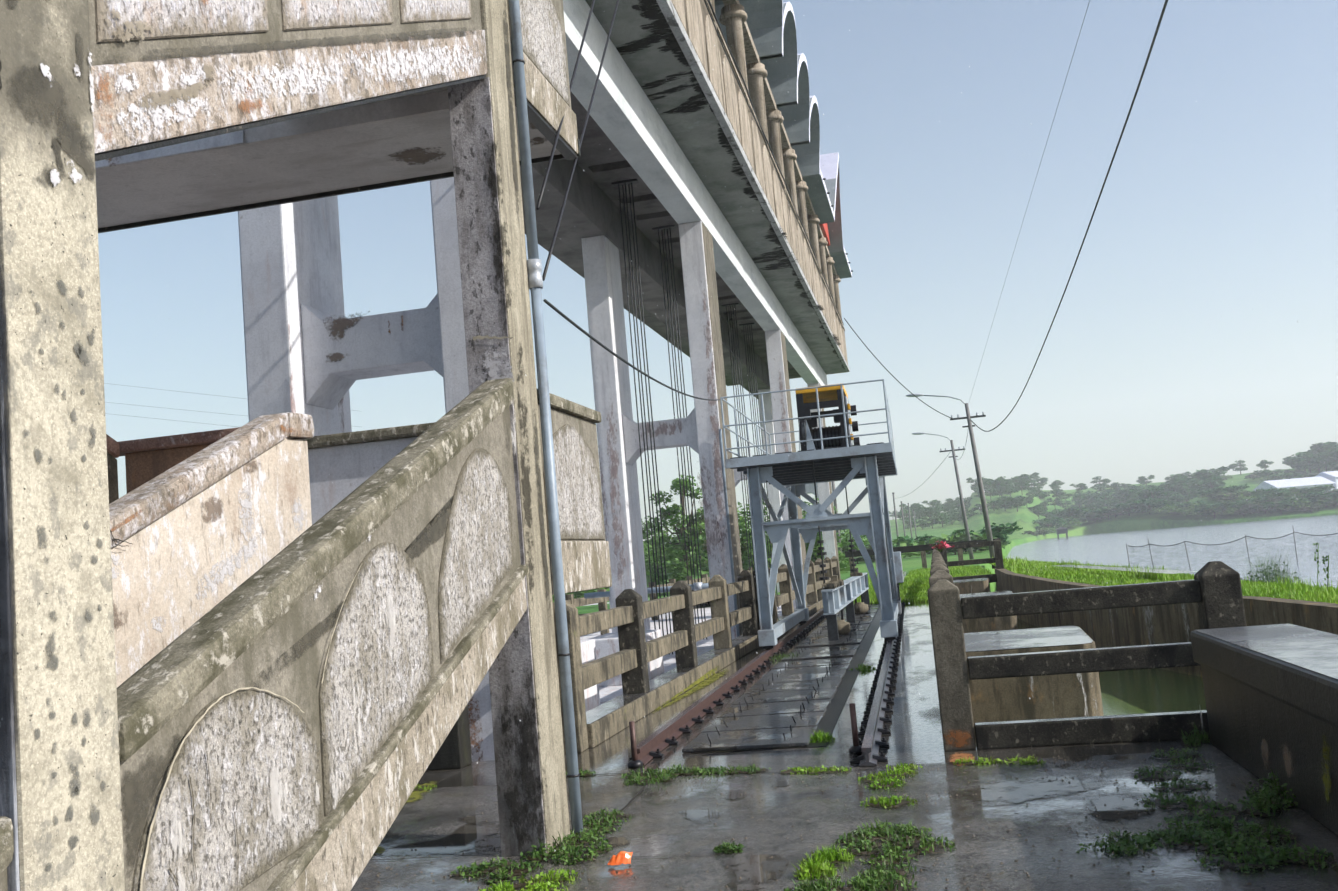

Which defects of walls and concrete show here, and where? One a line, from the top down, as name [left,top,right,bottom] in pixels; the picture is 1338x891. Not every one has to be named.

water stain [7,63,95,186]
water stain [74,33,95,115]
flaking render [115,45,481,134]
water stain [485,13,544,327]
water stain [616,0,845,369]
water stain [477,346,550,610]
mould [501,697,548,854]
rust [945,730,974,766]